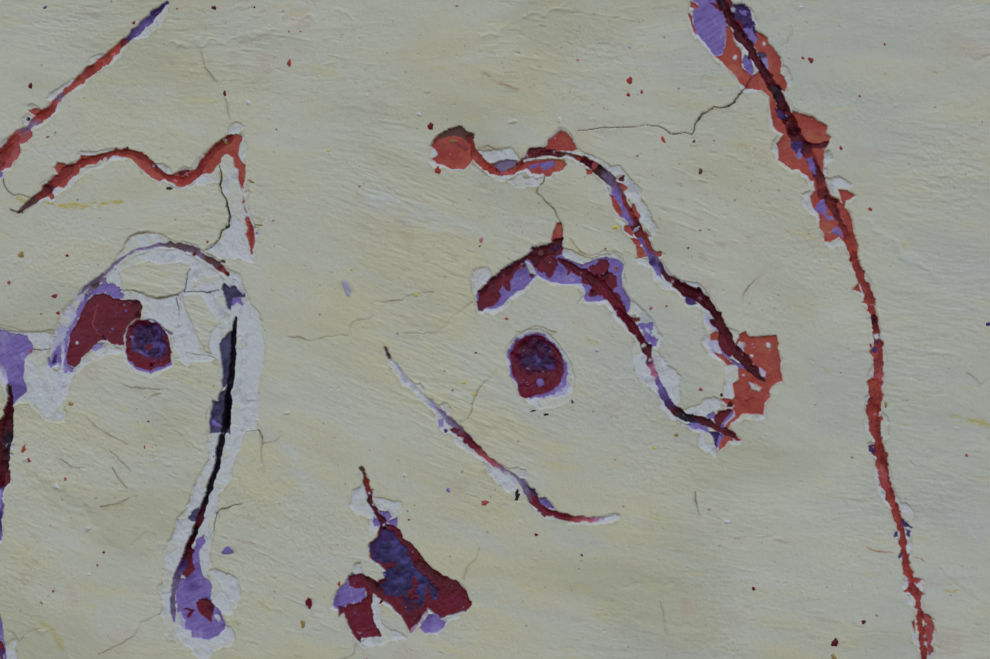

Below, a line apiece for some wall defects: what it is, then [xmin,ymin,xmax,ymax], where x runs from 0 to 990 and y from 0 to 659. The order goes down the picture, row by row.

peeling [0,275,143,545]
peeling [206,156,259,265]
crack [383,0,936,659]
peeling [329,466,472,649]